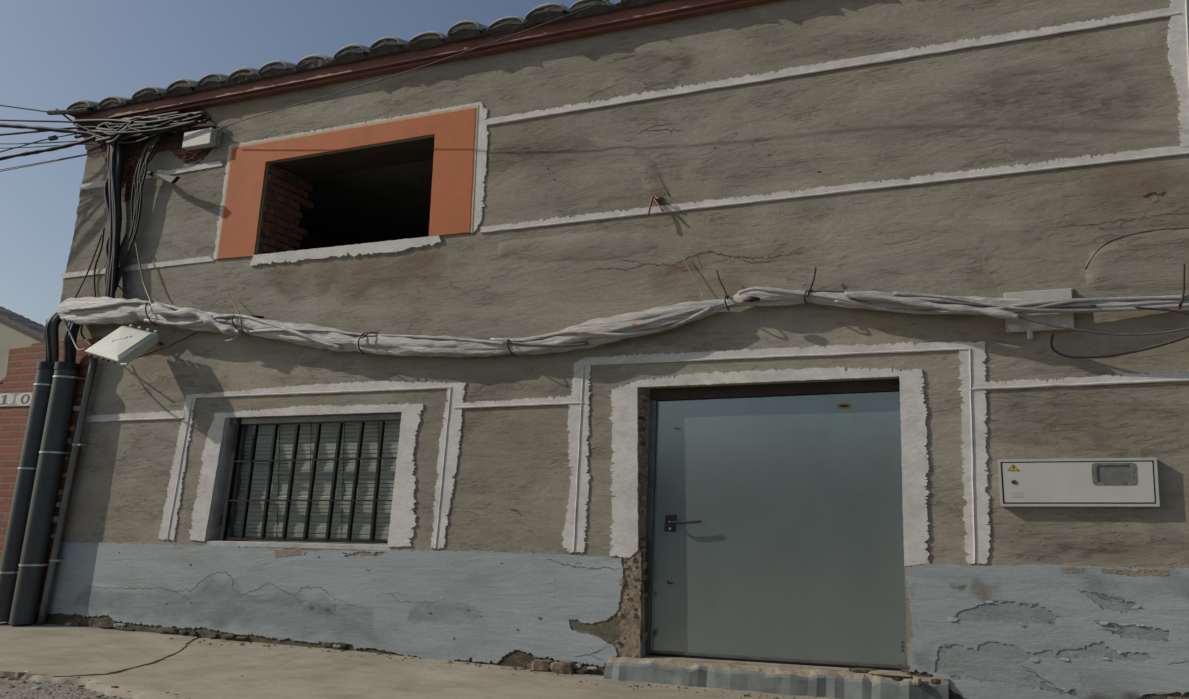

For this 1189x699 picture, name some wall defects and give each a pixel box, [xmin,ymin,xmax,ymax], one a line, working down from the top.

spalling [121,108,216,202]
crack [576,250,811,273]
spalling [455,388,650,676]
spalling [36,612,420,658]
crack [96,571,436,609]
peeling [899,589,1170,699]